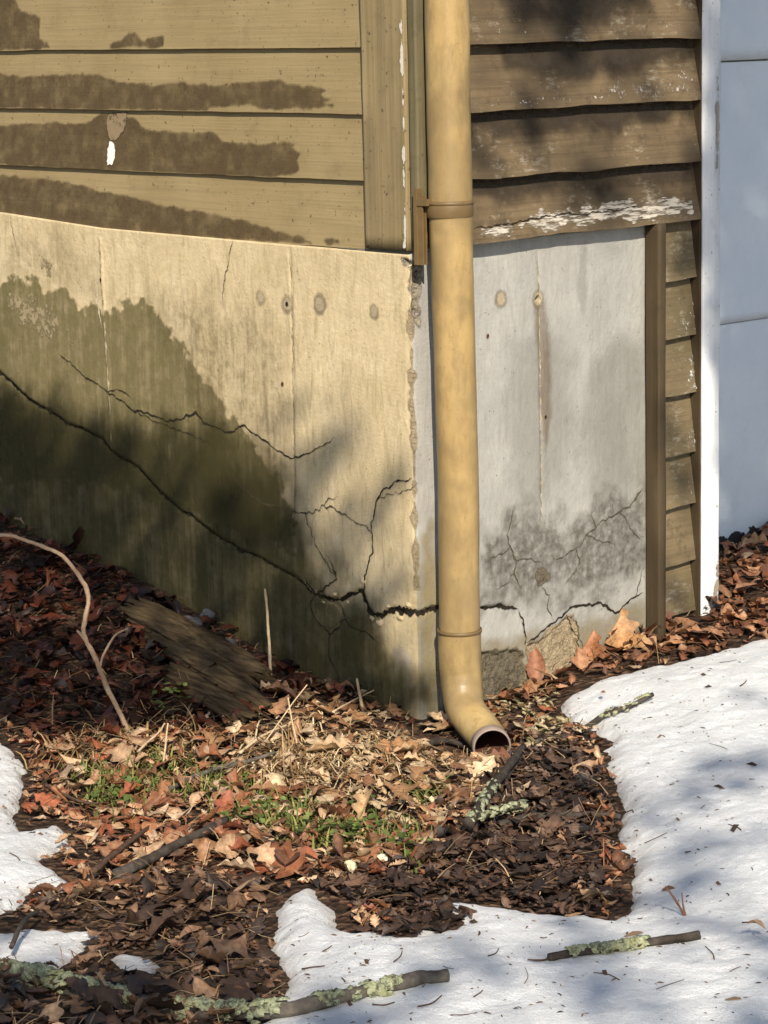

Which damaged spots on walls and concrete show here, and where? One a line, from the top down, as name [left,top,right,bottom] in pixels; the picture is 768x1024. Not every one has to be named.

water stain [0,0,47,50]
water stain [110,34,163,48]
peeling [107,110,127,165]
water stain [0,75,333,243]
peeling [481,197,694,237]
crack [59,353,335,459]
spalling [401,208,423,590]
crack [0,371,439,674]
crack [480,486,645,647]
water stain [486,497,645,596]
spalling [481,614,579,700]